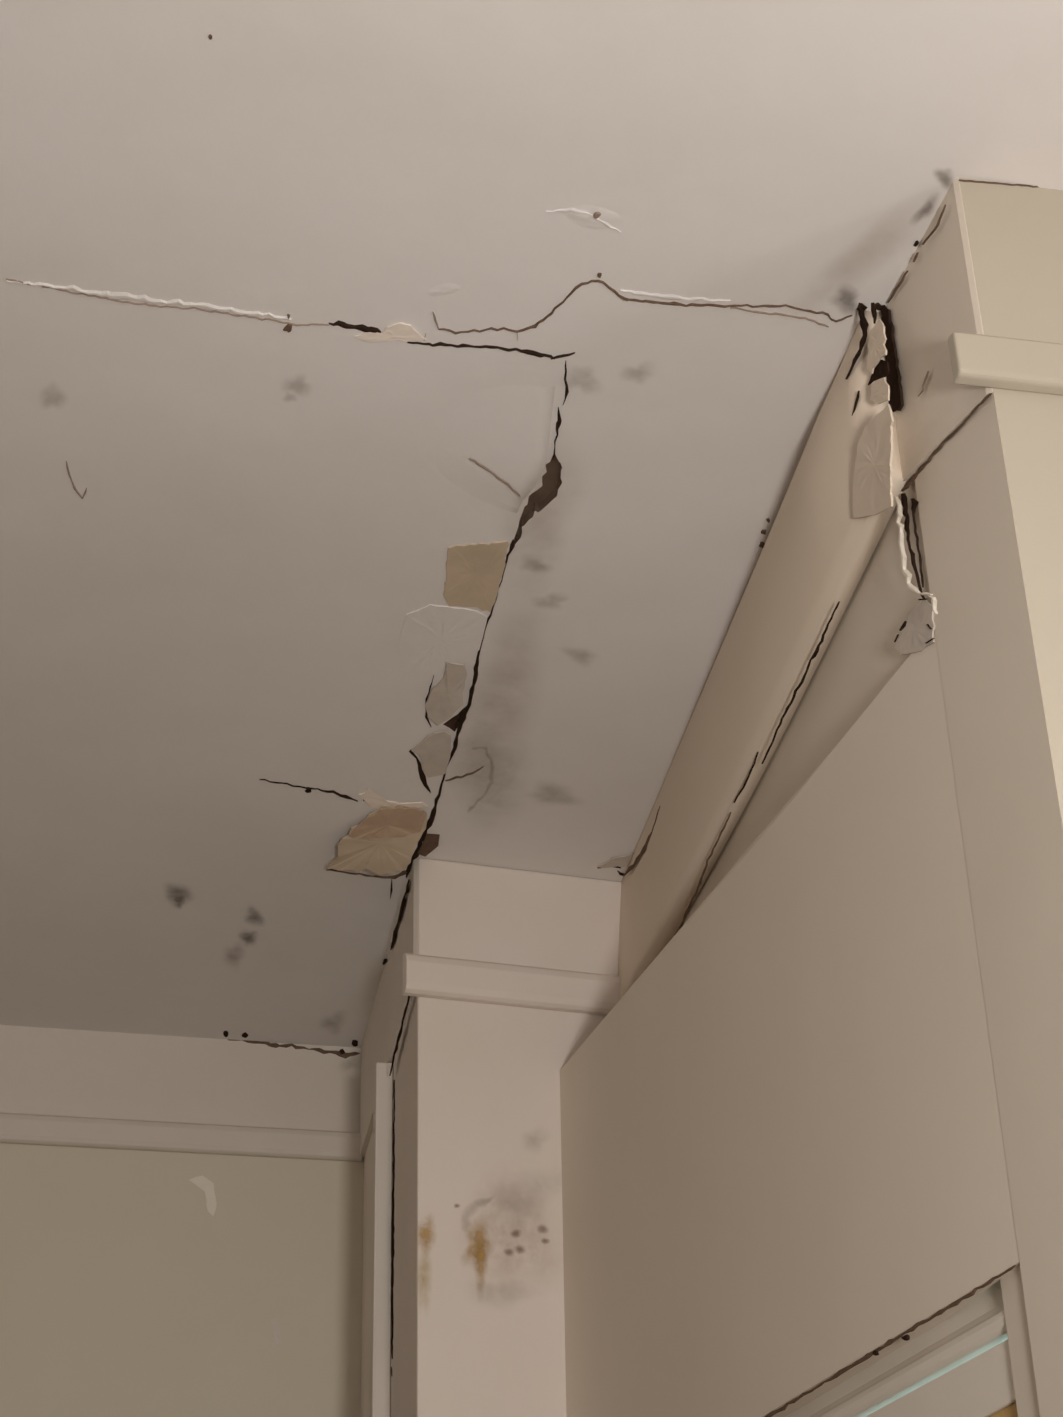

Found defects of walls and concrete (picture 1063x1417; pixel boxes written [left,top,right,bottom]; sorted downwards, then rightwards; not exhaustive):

crack [887,179,1038,303]
flaking render [845,302,904,415]
crack [6,273,852,965]
crack [894,493,938,655]
flaking render [328,805,427,875]
crack [765,1265,1016,1417]